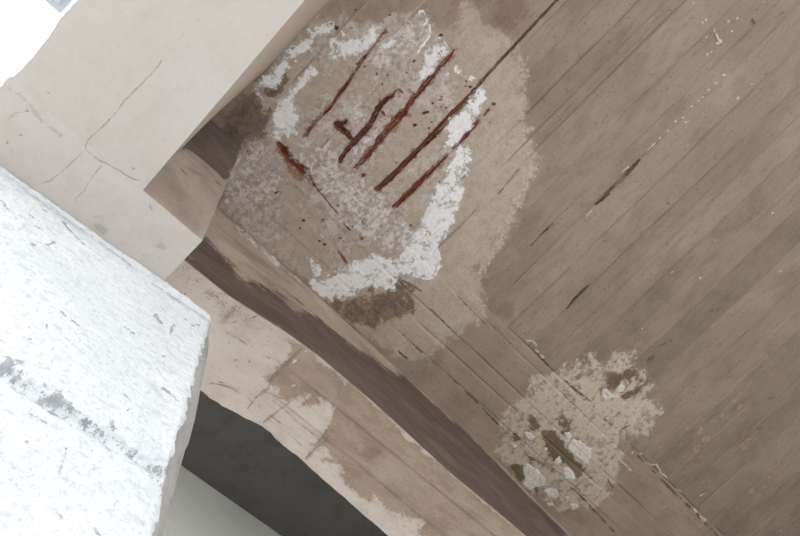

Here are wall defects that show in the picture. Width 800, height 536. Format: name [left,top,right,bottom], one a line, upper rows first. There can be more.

water stain [182,0,665,536]
peeling [602,368,644,402]
peeling [509,413,595,510]